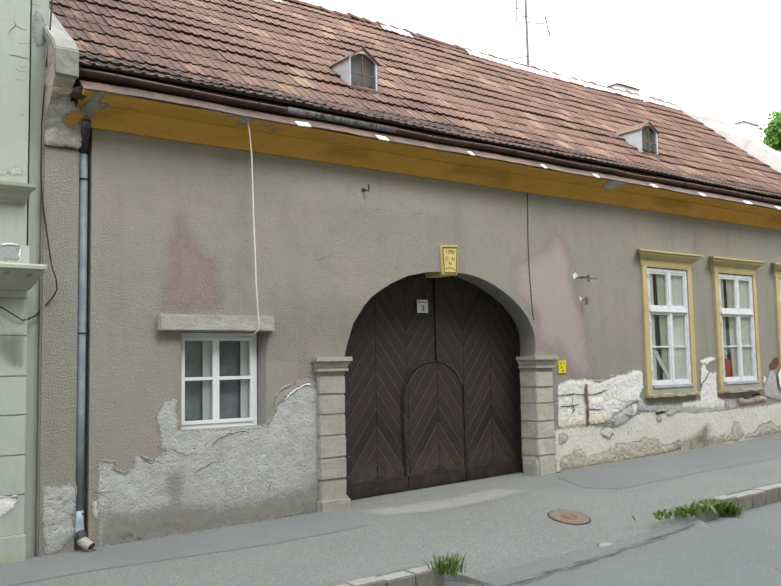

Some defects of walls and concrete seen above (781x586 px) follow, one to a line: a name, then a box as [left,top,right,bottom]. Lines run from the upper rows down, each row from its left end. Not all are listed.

spalling [44,86,110,149]
spalling [0,243,21,262]
spalling [557,356,781,471]
peeling [92,375,319,547]
peeling [0,495,19,517]
spalling [41,483,77,554]